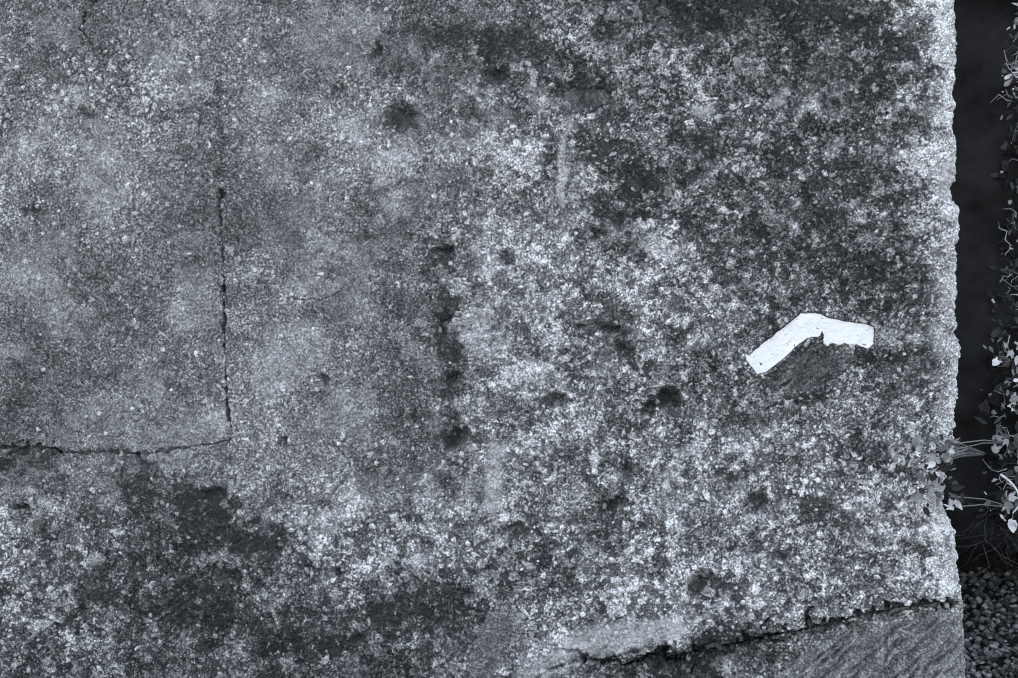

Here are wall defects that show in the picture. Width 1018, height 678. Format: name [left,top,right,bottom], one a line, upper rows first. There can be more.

crack [221,257,229,346]
crack [540,599,952,676]